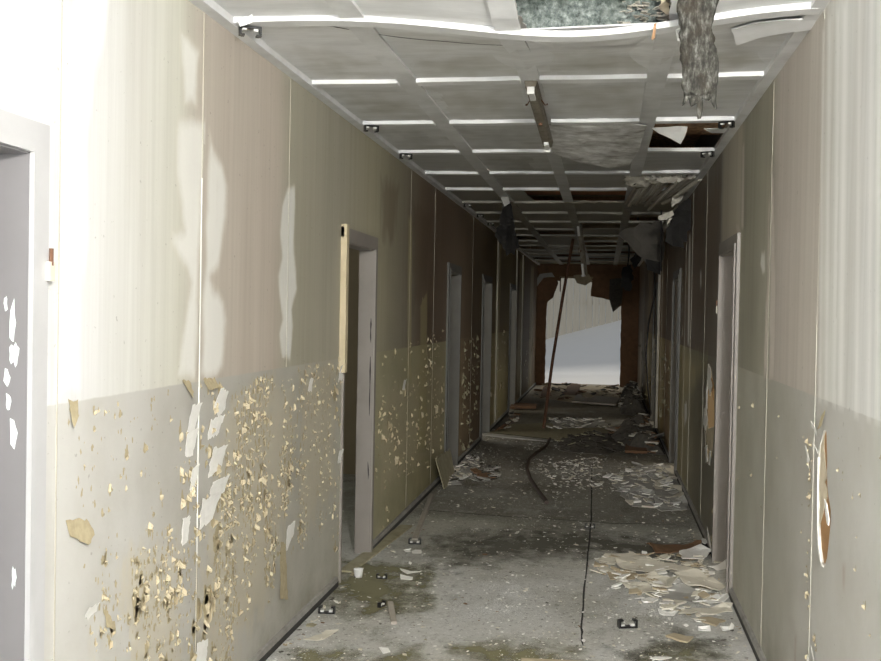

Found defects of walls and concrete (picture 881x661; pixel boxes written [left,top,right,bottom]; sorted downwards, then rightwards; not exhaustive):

peeling [3,296,19,449]
peeling [66,349,344,661]
peeling [375,329,444,528]
spalling [703,364,714,465]
spalling [800,410,843,567]
water stain [333,531,734,661]